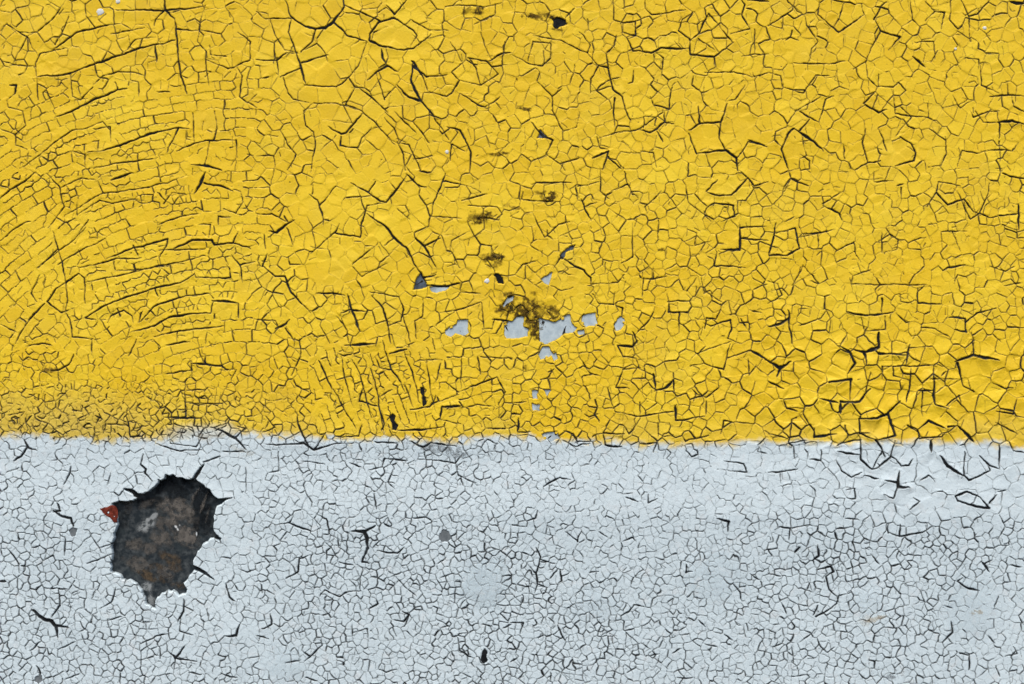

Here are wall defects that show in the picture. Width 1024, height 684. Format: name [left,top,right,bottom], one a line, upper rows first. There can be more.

crack [1,0,1023,284]
crack [0,111,679,684]
peeling [414,275,449,293]
peeling [445,320,469,337]
peeling [532,390,551,411]
peeling [504,313,598,361]
peeling [100,475,226,608]
crack [569,273,1021,684]